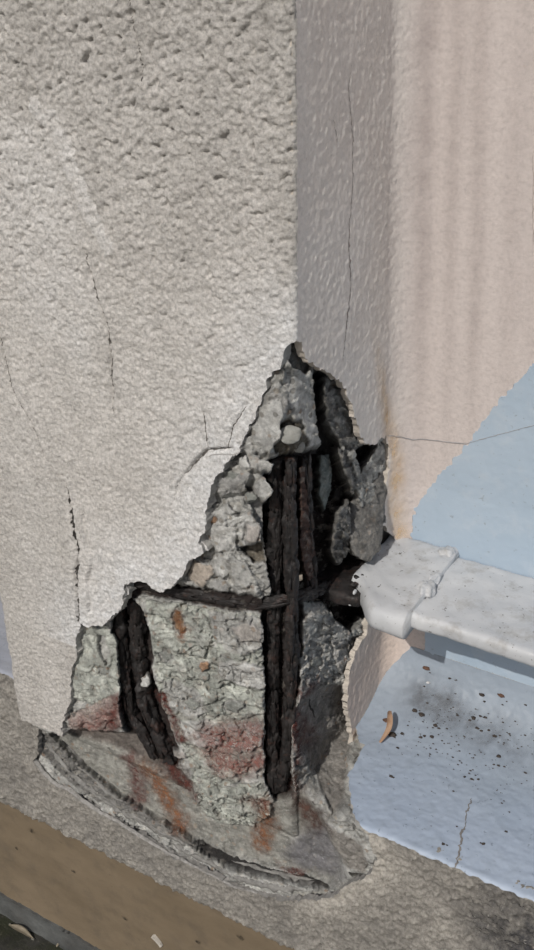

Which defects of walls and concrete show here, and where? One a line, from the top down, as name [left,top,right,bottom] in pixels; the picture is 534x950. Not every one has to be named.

crack [86,251,114,411]
crack [177,407,246,486]
crack [66,485,80,621]
spalling [32,343,389,897]
corrosion [123,755,196,834]
corrosion [201,726,265,774]
corrosion [288,710,323,828]